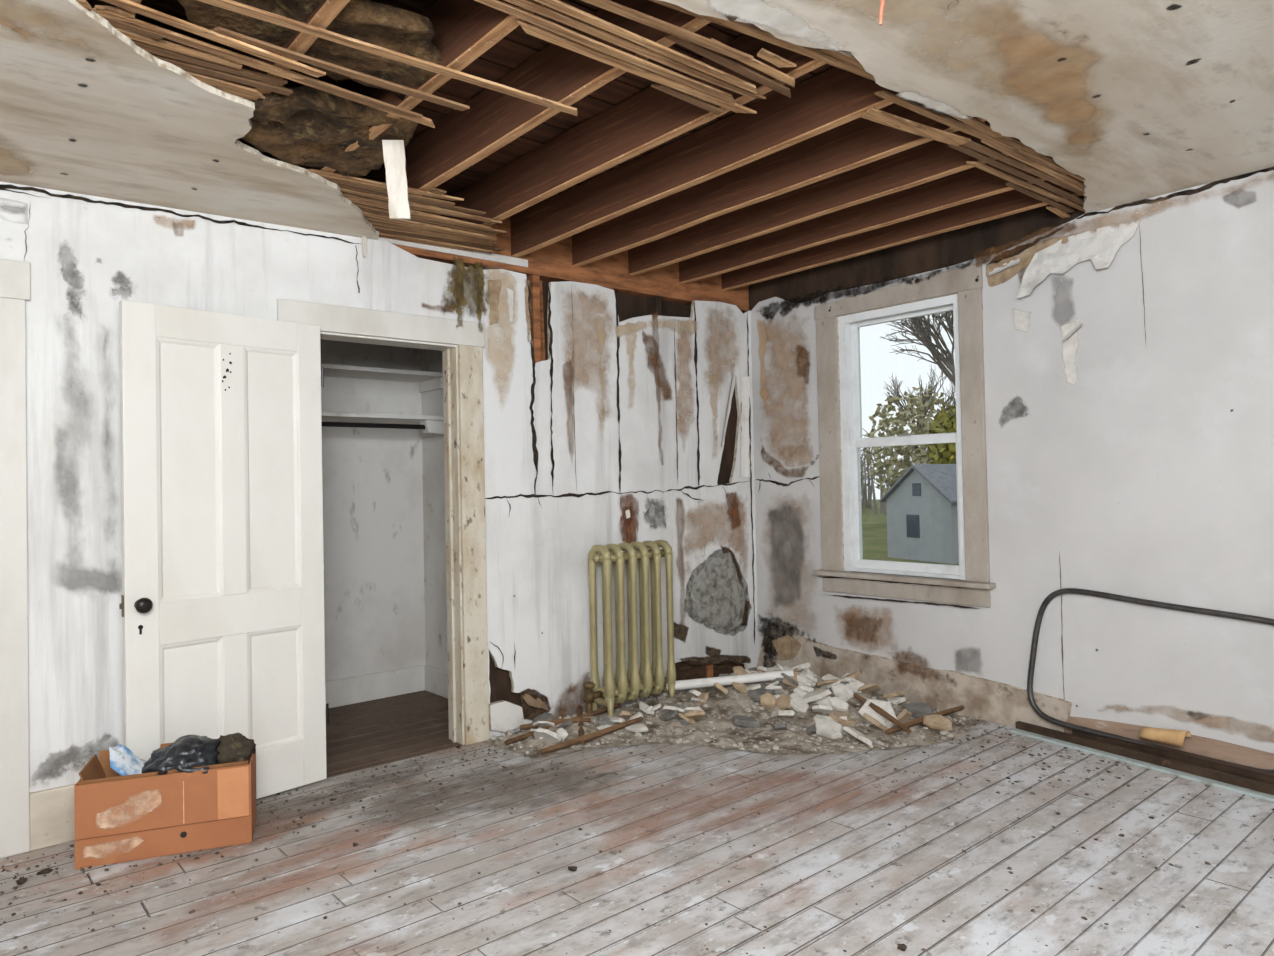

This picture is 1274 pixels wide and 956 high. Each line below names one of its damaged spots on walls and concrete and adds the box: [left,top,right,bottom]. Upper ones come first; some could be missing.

peeling [709,0,842,50]
crack [0,184,360,293]
leakage [564,293,610,420]
leakage [628,313,692,434]
peeling [986,221,1139,385]
crack [485,275,820,644]
leakage [61,567,120,592]
flaking render [674,546,752,642]
leakage [759,506,837,668]
flaking render [489,667,551,732]
flaking render [675,647,751,681]
leakage [1188,712,1231,729]